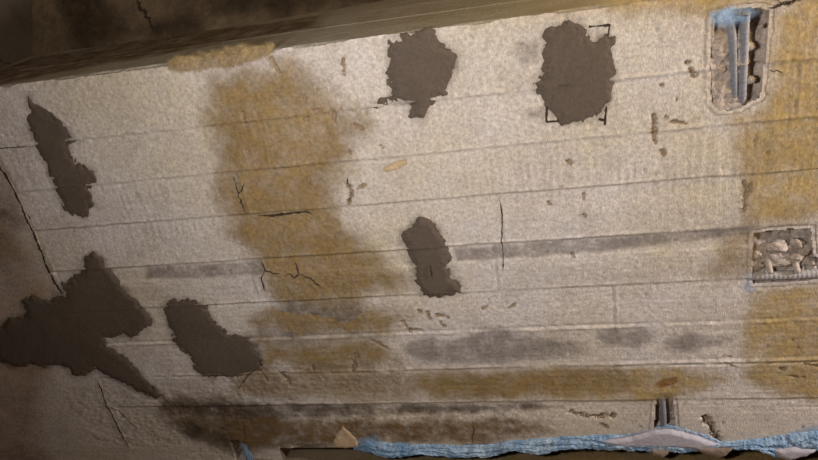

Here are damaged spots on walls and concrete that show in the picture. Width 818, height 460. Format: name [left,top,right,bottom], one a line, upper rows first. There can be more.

crack [136,0,158,32]
spalling [684,0,801,116]
damp [742,0,818,219]
damp [213,64,395,336]
damp [596,235,671,251]
damp [697,229,728,239]
spalling [746,224,818,288]
damp [256,340,384,369]
damp [410,332,571,361]
damp [747,289,818,398]
damp [415,369,706,400]
spalling [649,394,681,430]